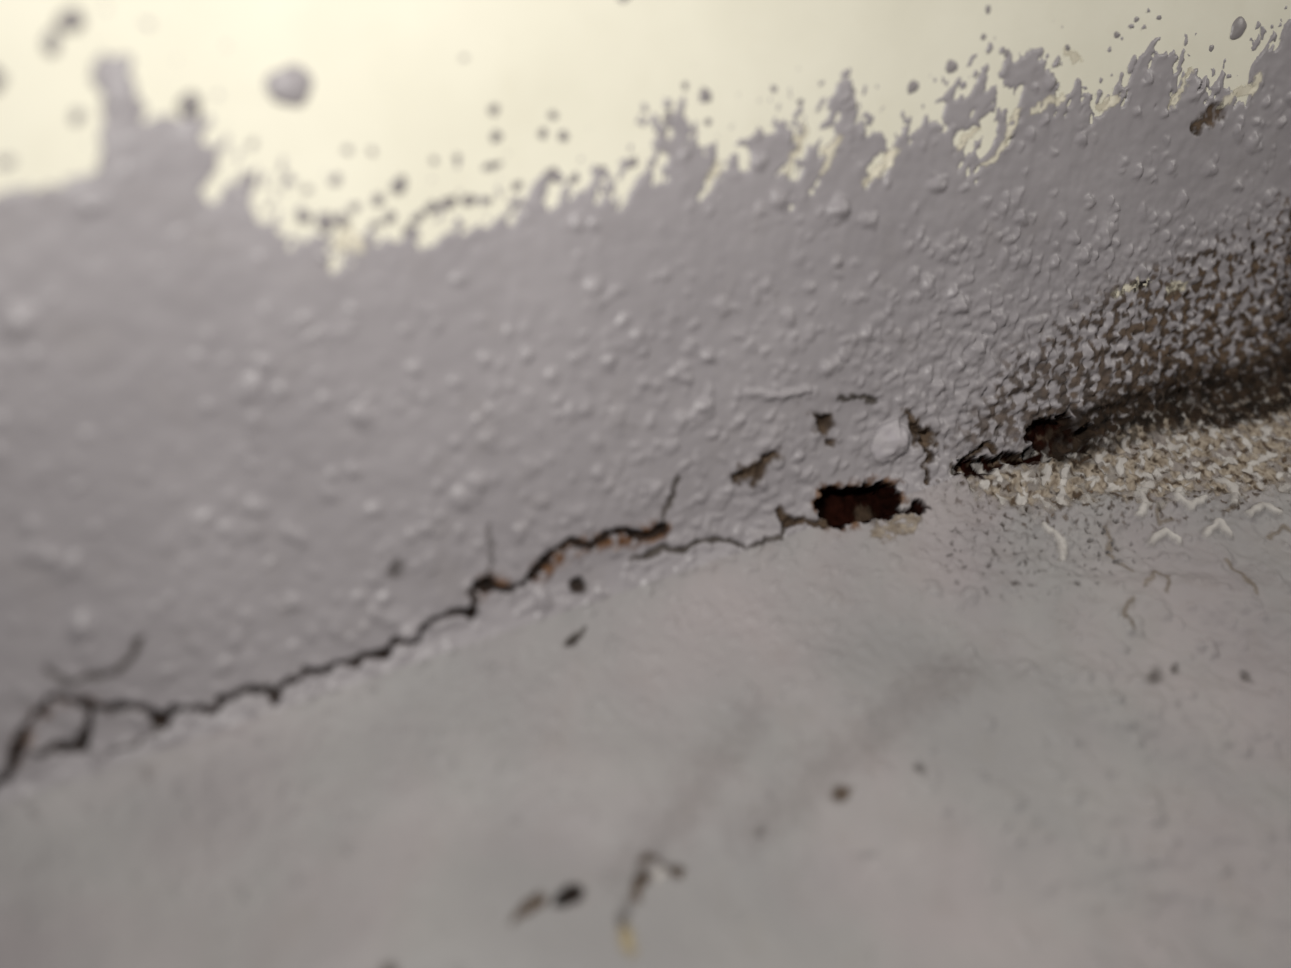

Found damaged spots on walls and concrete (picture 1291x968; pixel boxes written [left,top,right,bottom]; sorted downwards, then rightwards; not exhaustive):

peeling [1168,67,1193,109]
peeling [1217,72,1262,109]
peeling [820,135,843,175]
peeling [863,147,900,187]
peeling [980,94,1066,166]
peeling [1110,277,1188,299]
leakage [1050,347,1291,468]
spalling [905,409,939,485]
spalling [950,371,1291,560]
spalling [775,479,930,539]
crack [0,475,785,782]